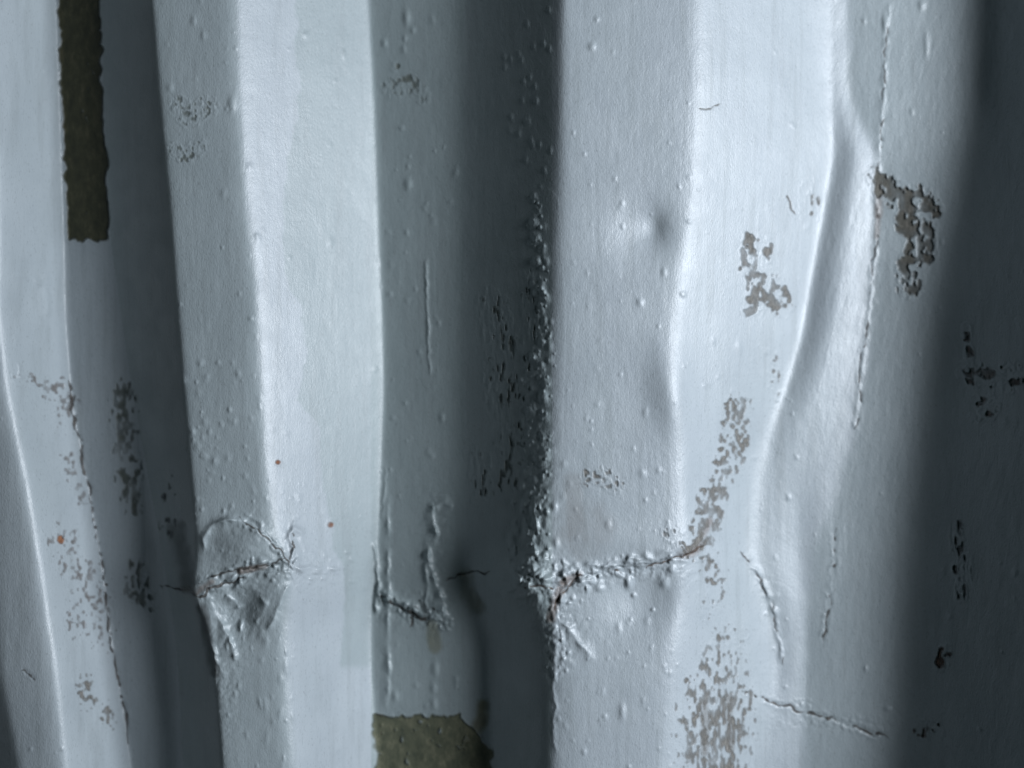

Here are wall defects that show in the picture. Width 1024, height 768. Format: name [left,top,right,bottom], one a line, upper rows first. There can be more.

peeling [57,0,109,242]
peeling [873,167,941,295]
peeling [739,232,791,315]
crack [854,323,869,429]
peeling [664,398,749,598]
crack [161,523,295,598]
crack [381,596,435,626]
crack [524,574,581,610]
crack [648,546,702,566]
peeling [372,714,493,768]
peeling [680,634,756,768]
crack [747,691,886,736]